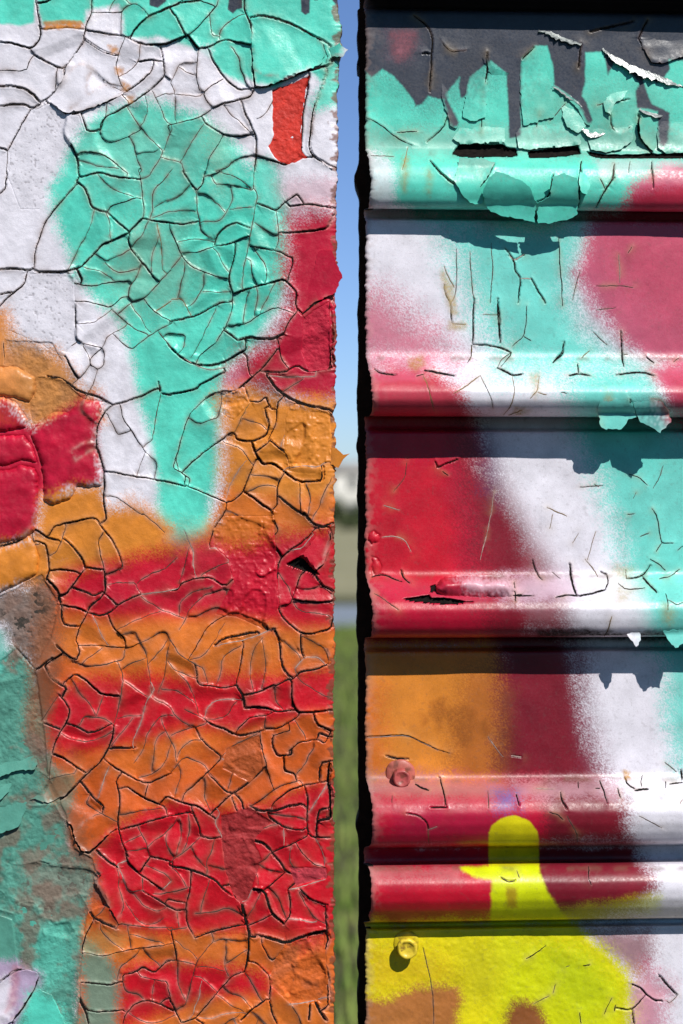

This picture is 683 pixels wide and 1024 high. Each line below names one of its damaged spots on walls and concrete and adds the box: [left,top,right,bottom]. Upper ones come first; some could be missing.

peeling [640,38,683,63]
peeling [442,51,683,154]
peeling [453,157,590,224]
crack [374,242,678,416]
peeling [597,398,671,433]
crack [0,0,334,1024]
crack [513,467,683,605]
peeling [627,632,641,647]
peeling [663,629,683,648]
crack [392,777,447,842]
crack [516,762,683,843]
crack [580,975,678,1023]